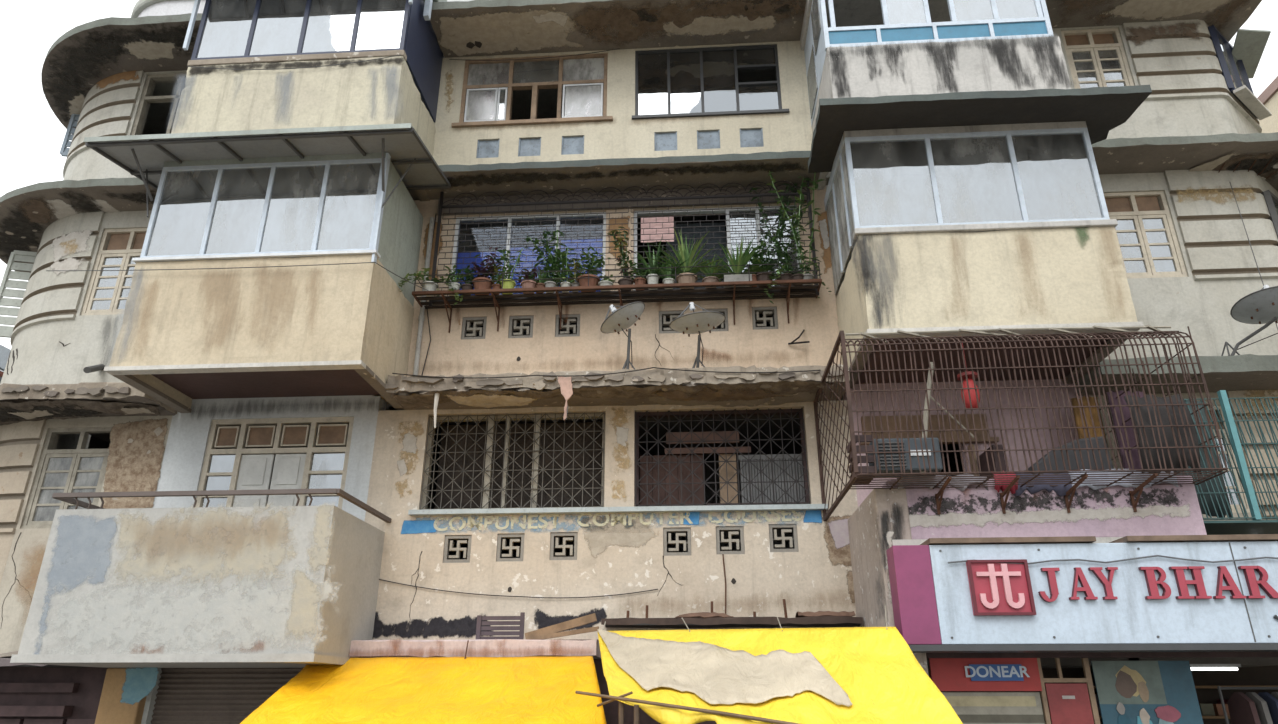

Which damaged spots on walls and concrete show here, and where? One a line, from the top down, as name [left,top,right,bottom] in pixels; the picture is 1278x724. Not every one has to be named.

spalling [439,0,804,57]
peeling [1102,0,1231,20]
peeling [97,40,175,89]
water stain [830,49,850,97]
water stain [858,45,908,78]
water stain [923,42,958,92]
water stain [975,36,1072,86]
water stain [1076,227,1088,244]
water stain [852,235,894,325]
spalling [376,367,844,410]
peeling [0,385,337,654]
crack [1,532,32,626]